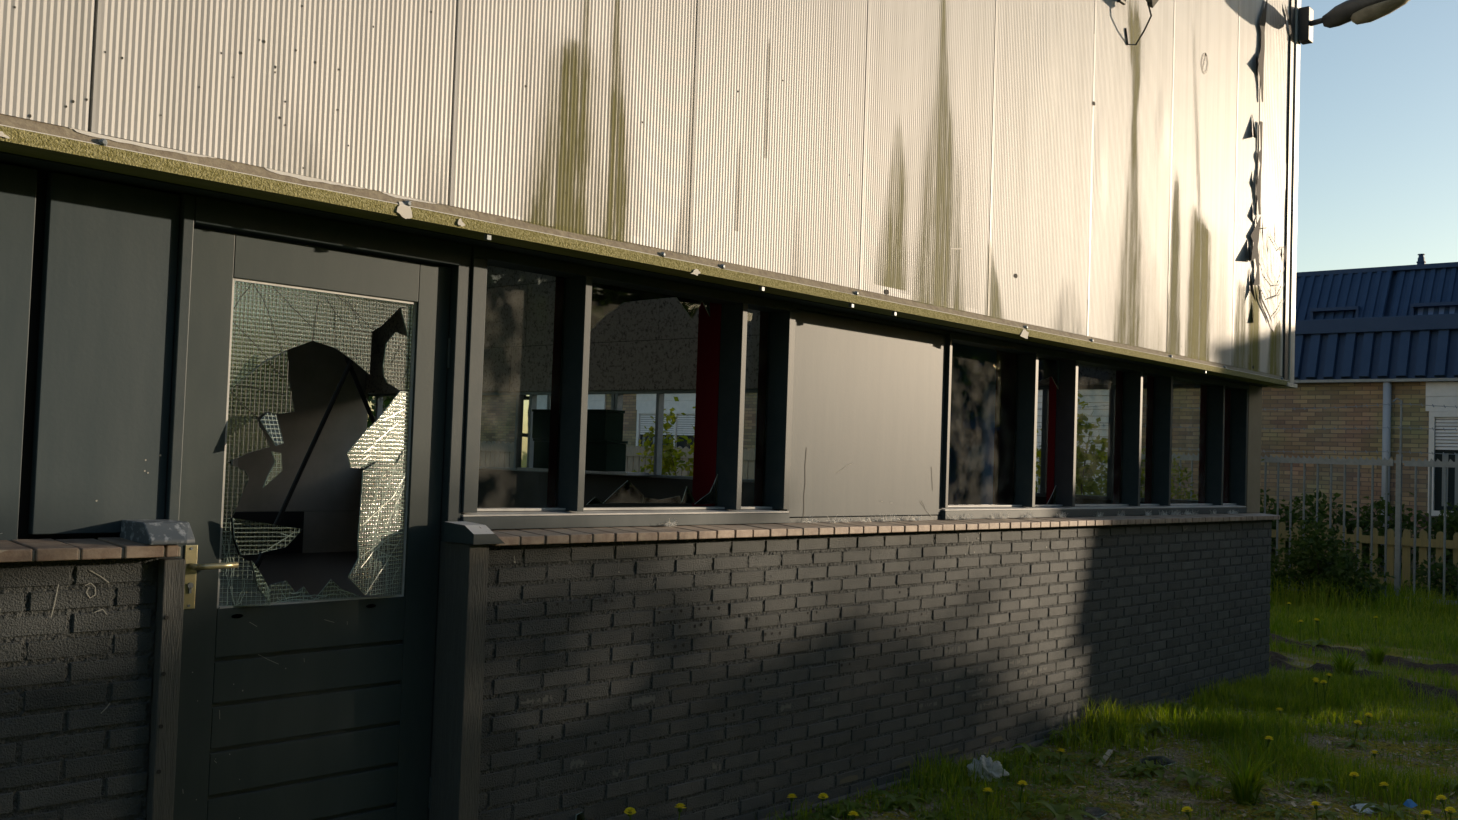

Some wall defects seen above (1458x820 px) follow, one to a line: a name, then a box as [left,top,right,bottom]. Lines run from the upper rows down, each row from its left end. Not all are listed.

water stain [502,1,643,237]
water stain [898,0,979,309]
water stain [1104,1,1219,359]